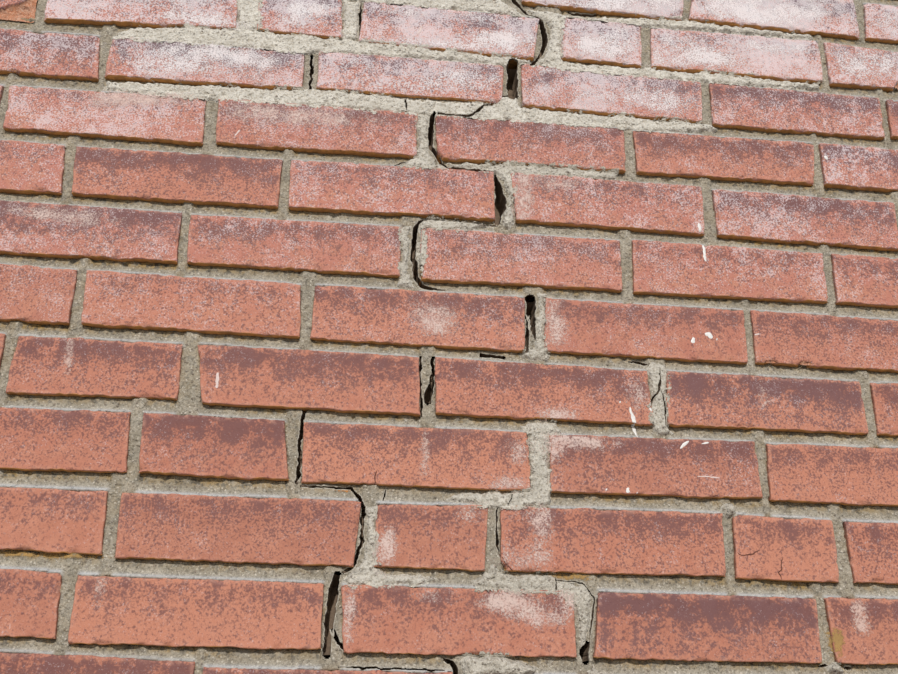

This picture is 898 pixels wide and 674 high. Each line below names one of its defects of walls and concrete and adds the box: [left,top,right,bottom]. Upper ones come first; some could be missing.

crack [356,3,364,38]
crack [409,0,549,292]
crack [481,299,538,361]
crack [416,358,436,417]
crack [629,360,667,427]
crack [294,411,459,674]
crack [494,494,513,571]
crack [554,577,596,662]